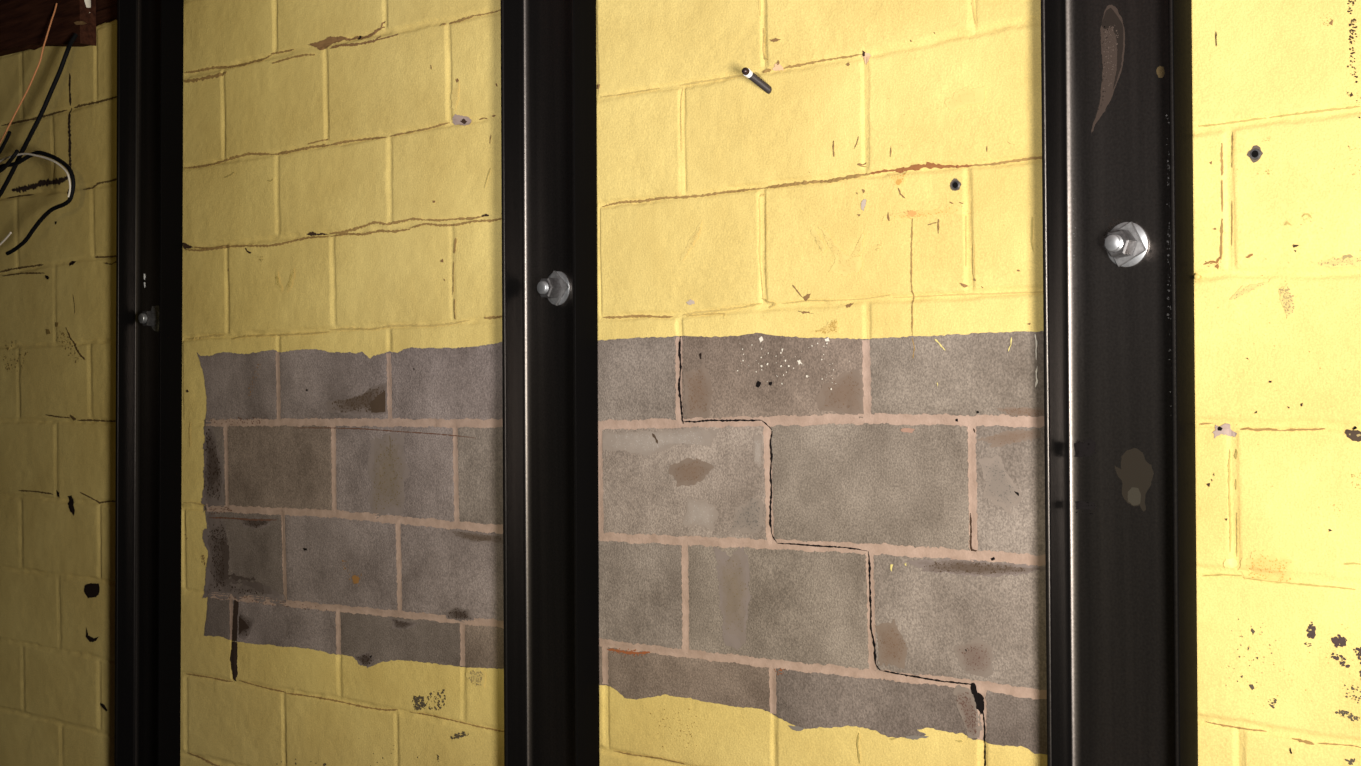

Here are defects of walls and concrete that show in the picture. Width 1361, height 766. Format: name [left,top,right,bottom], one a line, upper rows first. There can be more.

peeling [197,342,504,681]
water stain [412,690,446,711]
crack [602,156,1043,766]
peeling [598,331,1047,755]
water stain [1221,619,1361,721]